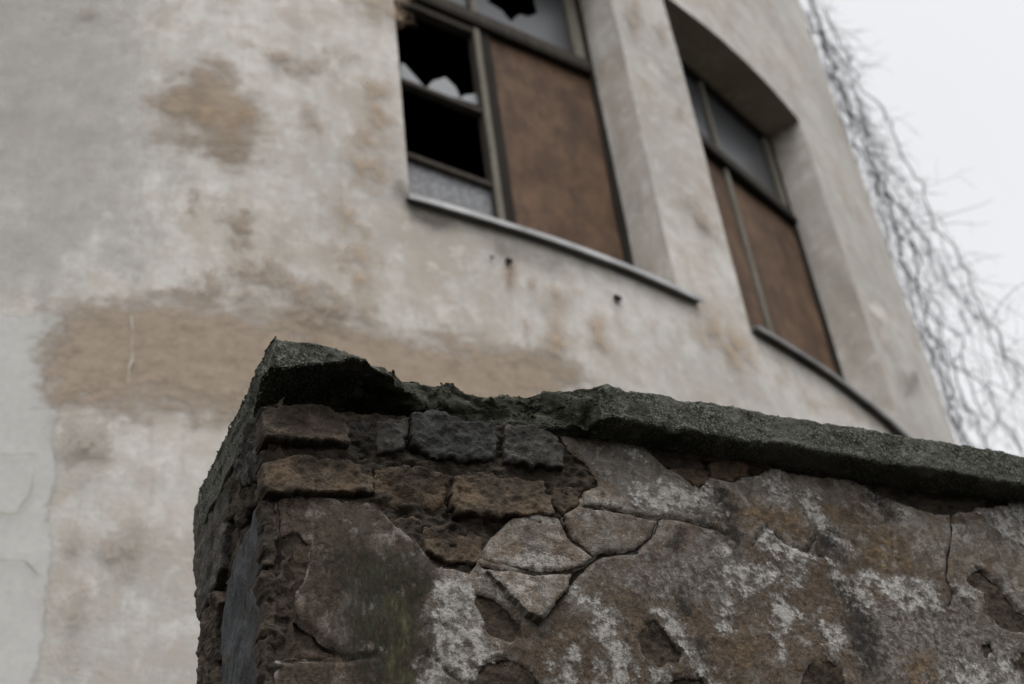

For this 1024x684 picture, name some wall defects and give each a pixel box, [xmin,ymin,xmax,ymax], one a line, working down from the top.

crack [537,508,727,626]
flaking render [253,404,1024,684]
crack [946,515,959,622]